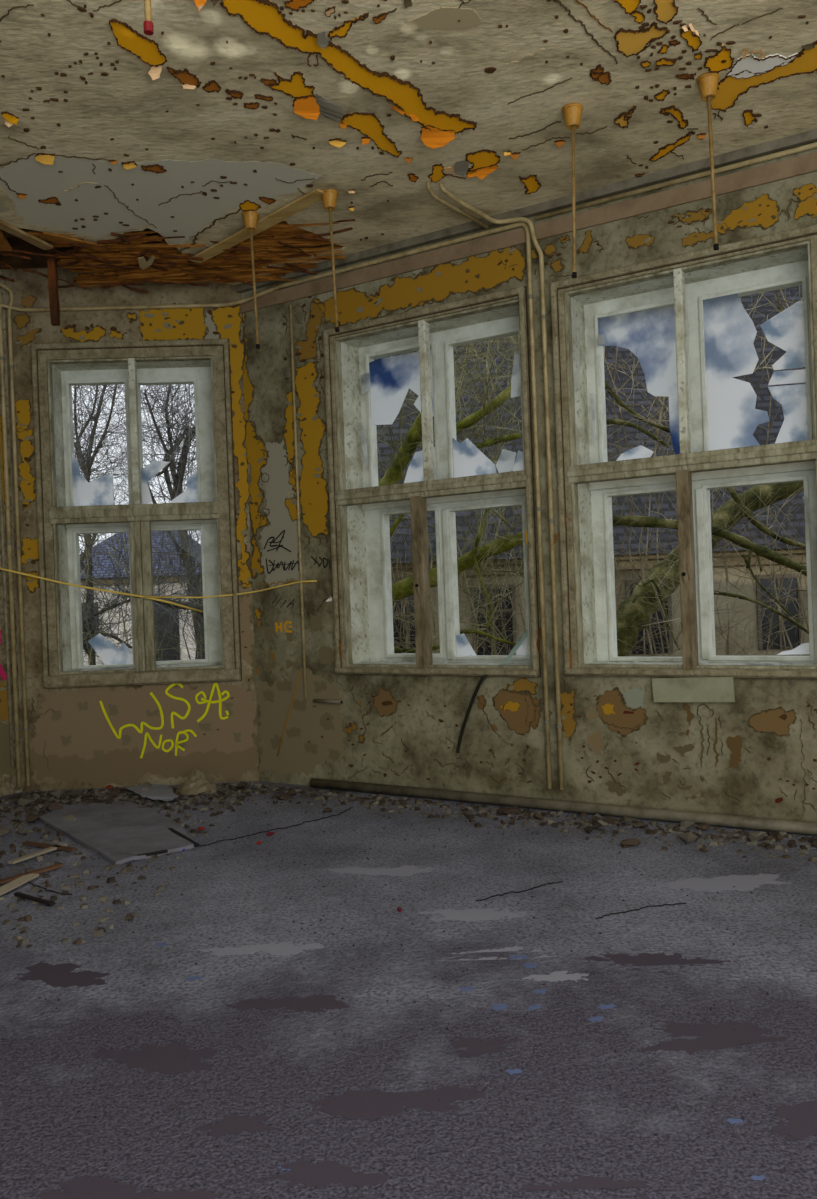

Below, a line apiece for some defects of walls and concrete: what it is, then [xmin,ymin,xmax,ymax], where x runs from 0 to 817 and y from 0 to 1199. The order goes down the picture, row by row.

peeling [108,0,521,183]
crack [507,78,572,105]
crack [556,0,664,65]
peeling [614,0,817,177]
crack [698,8,783,41]
crack [0,136,241,255]
peeling [0,398,37,513]
peeling [60,230,603,589]
spalling [596,687,724,799]
water stain [14,962,110,988]
water stain [304,1086,486,1120]
water stain [31,1176,227,1199]